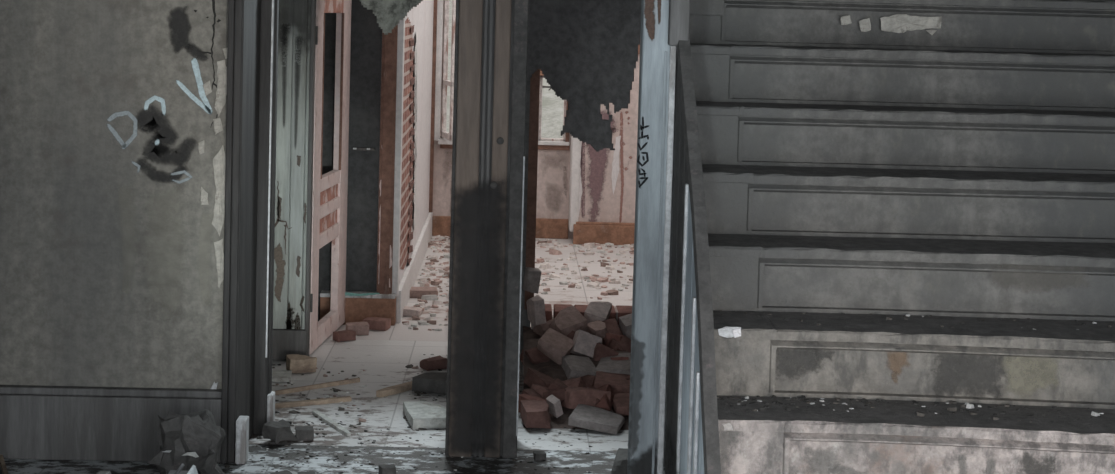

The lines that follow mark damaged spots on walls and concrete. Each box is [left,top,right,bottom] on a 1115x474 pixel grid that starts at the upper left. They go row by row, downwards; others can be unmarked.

peeling [840,14,942,35]
flaking render [198,48,227,287]
leakage [580,141,608,222]
leakage [808,449,861,474]